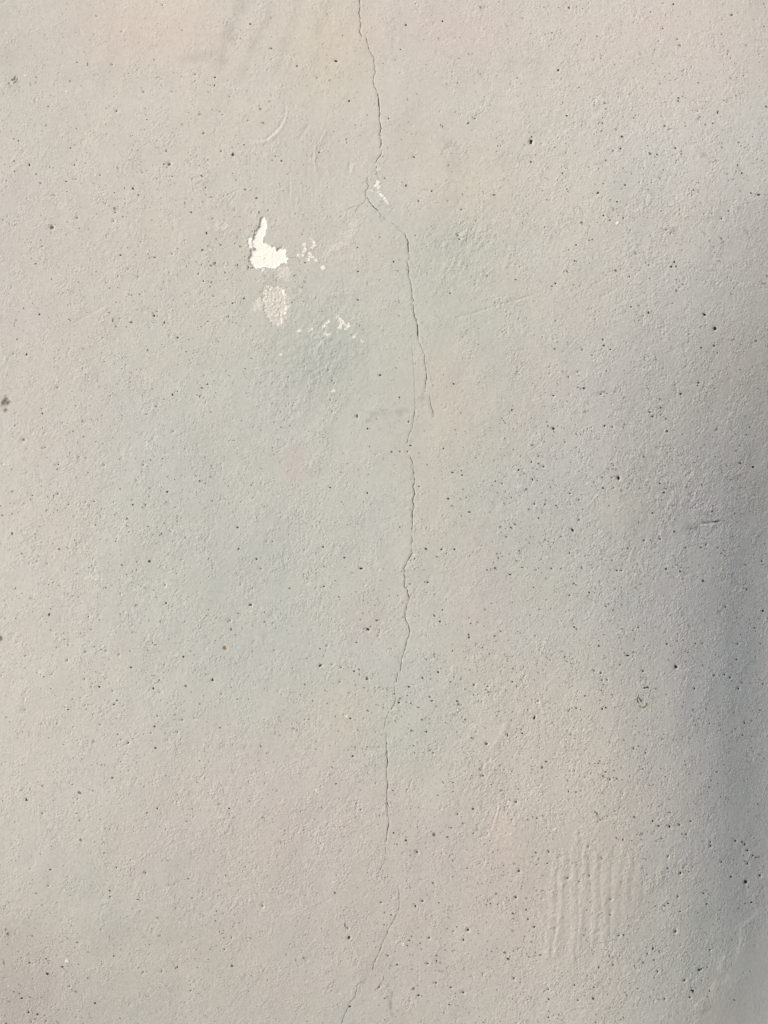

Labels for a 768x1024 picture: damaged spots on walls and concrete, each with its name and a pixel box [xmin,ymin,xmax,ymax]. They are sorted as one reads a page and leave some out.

peeling [246,216,327,327]